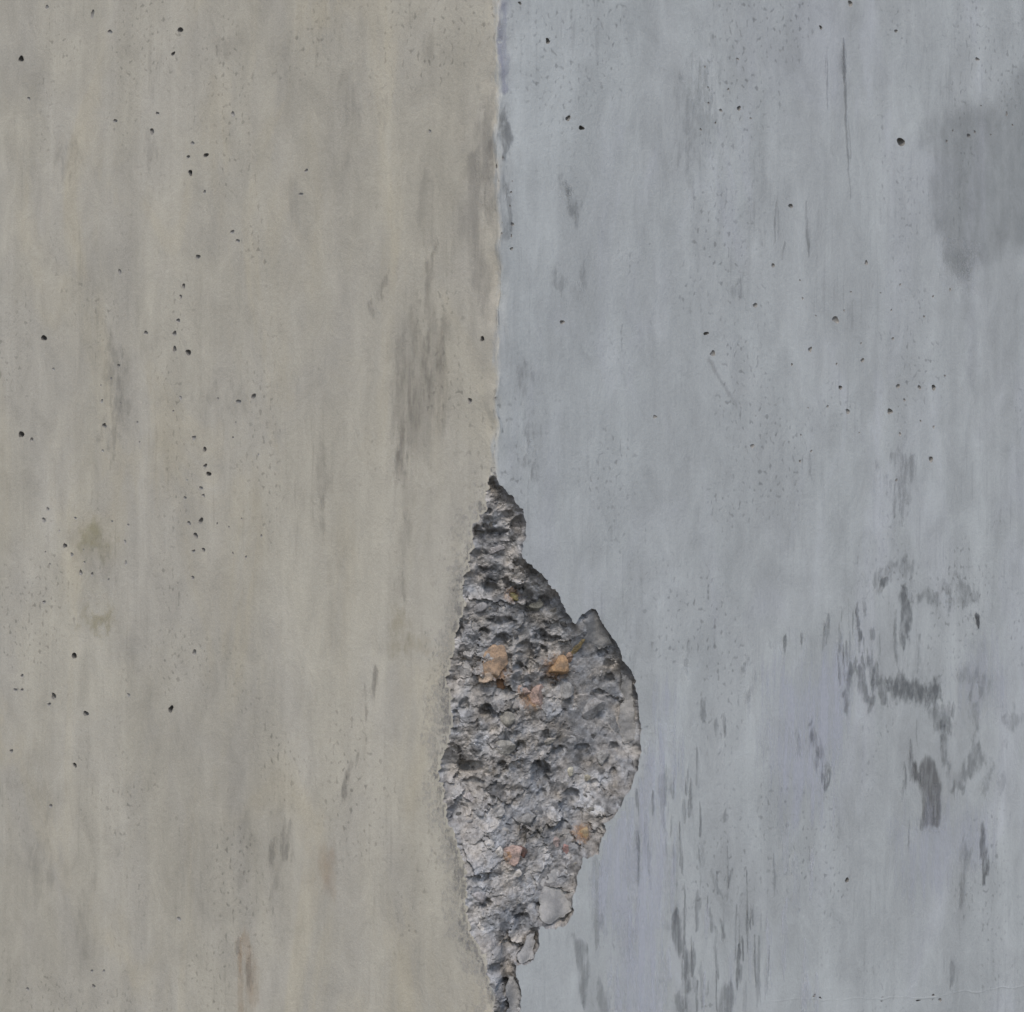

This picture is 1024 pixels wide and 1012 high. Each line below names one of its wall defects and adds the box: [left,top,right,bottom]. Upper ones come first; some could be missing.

spalling [434,469,642,1012]